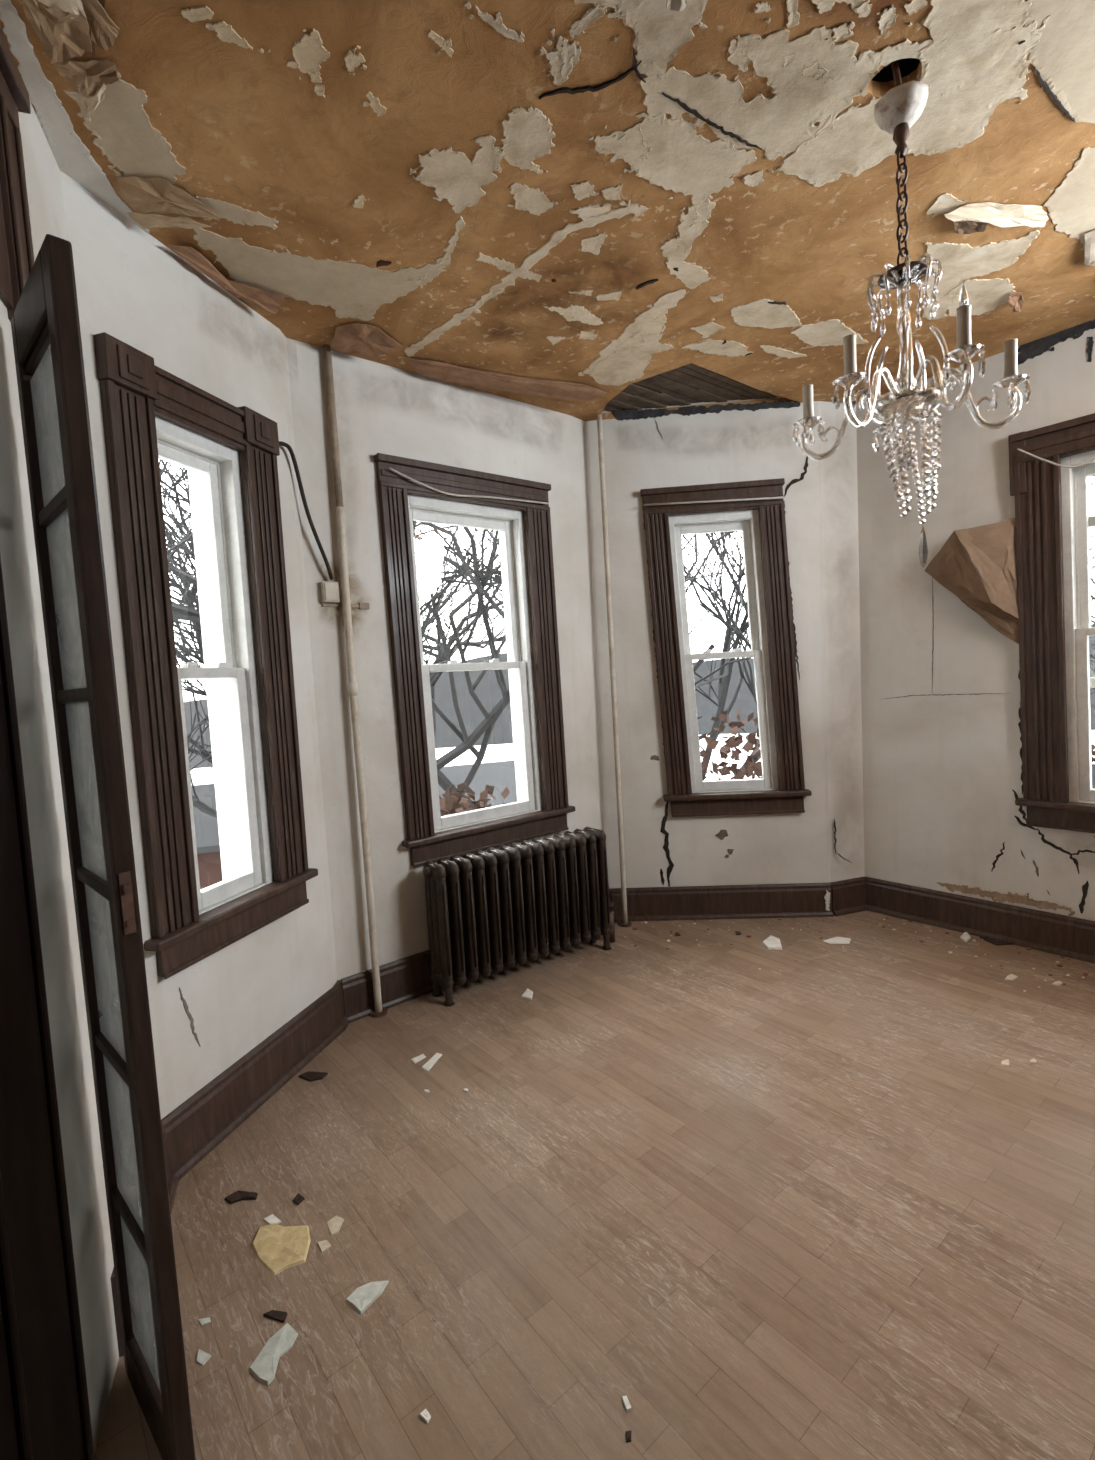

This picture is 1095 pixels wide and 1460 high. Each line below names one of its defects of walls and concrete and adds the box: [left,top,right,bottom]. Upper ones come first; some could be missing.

flaking render [0,0,149,234]
peeling [181,5,367,98]
peeling [363,91,387,117]
crack [539,49,762,150]
crack [1019,40,1075,121]
peeling [192,195,279,230]
peeling [352,194,370,208]
flaking render [404,0,1050,421]
crack [642,504,674,887]
crack [885,577,1095,914]